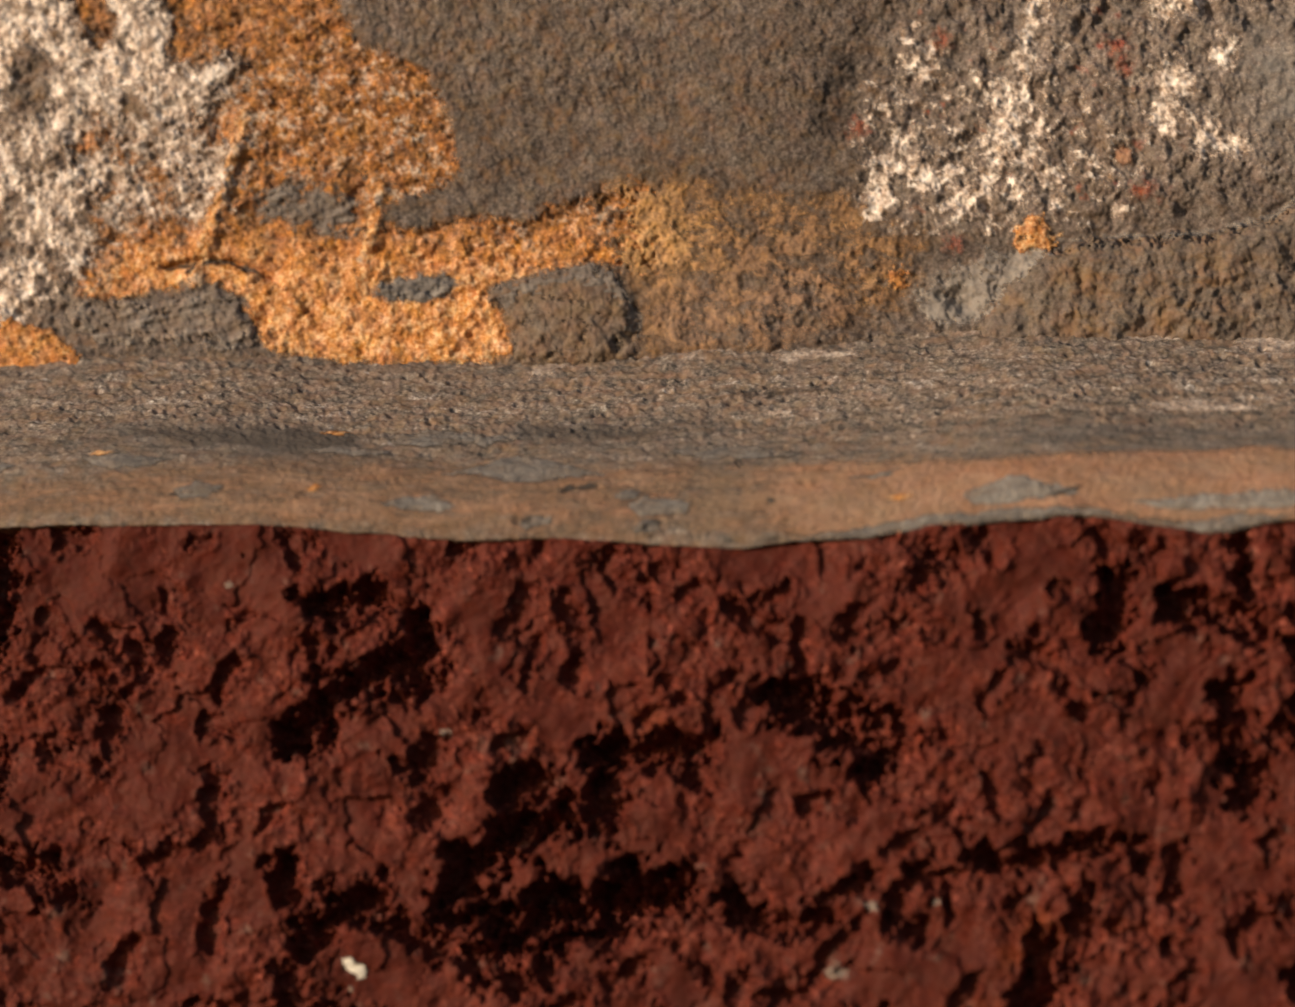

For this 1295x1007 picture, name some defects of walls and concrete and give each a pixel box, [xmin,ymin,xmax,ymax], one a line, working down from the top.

water stain [0,0,250,328]
peeling [0,0,657,367]
water stain [618,0,1148,353]
peeling [888,263,910,290]
water stain [1105,51,1257,162]
water stain [1140,0,1242,72]